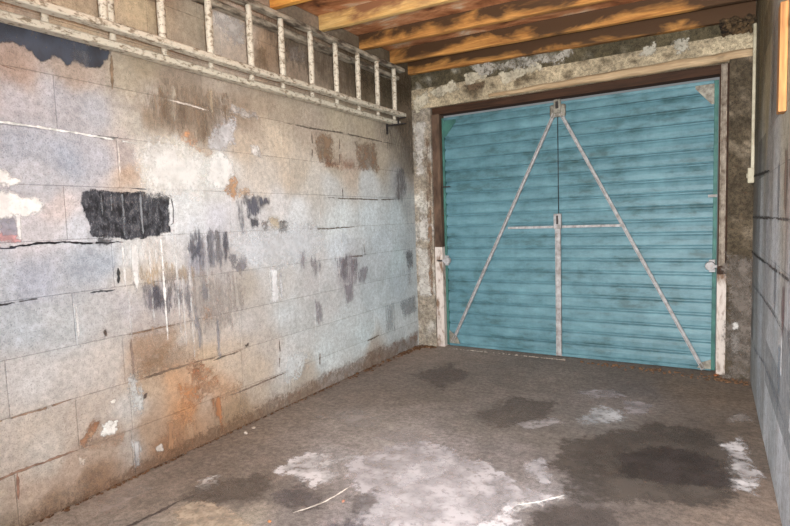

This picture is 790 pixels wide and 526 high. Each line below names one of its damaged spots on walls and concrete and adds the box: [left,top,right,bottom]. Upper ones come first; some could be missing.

crack [0,241,123,249]
water stain [143,229,229,308]
rust [169,359,242,449]
water stain [274,435,561,526]